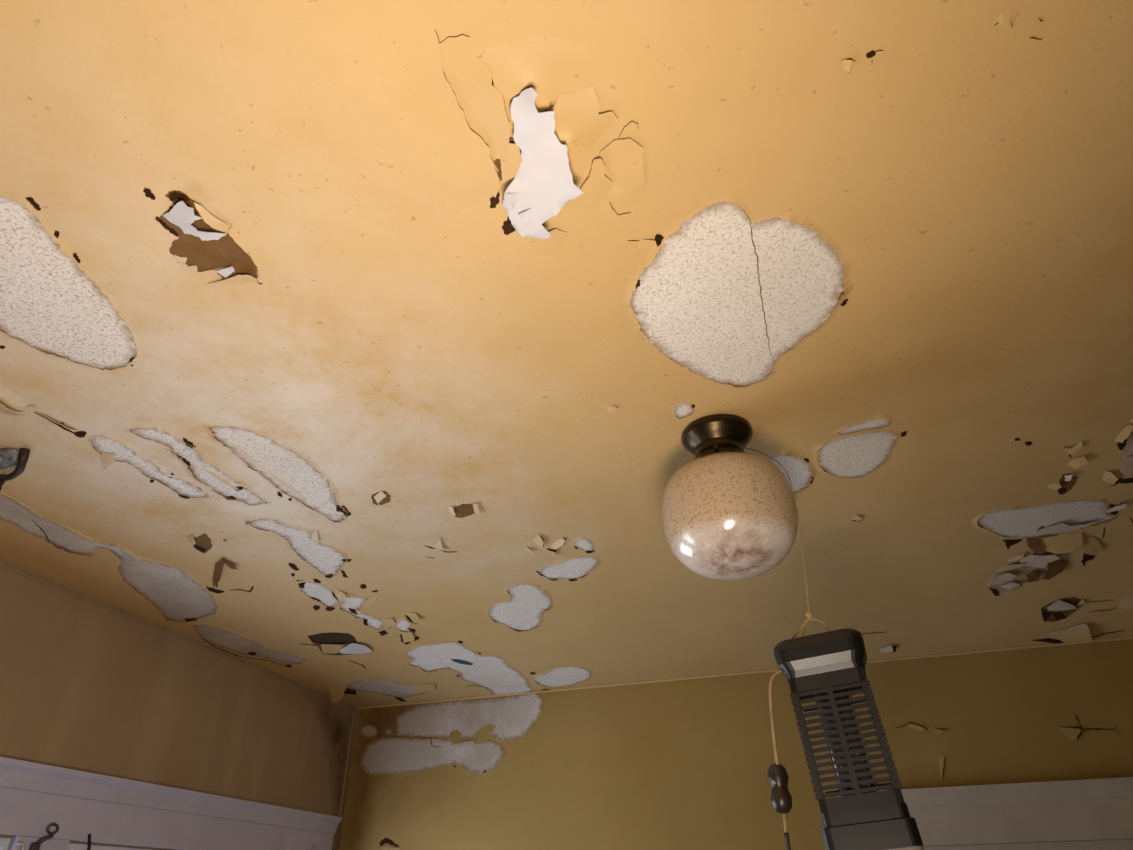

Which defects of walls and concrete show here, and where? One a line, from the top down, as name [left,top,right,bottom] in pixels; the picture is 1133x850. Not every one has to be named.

peeling [371,30,646,256]
peeling [0,190,145,373]
peeling [143,188,281,288]
peeling [622,195,853,389]
peeling [764,413,907,495]
peeling [971,442,1133,596]
peeling [1102,420,1133,486]
peeling [0,422,602,777]
crack [1059,714,1121,740]